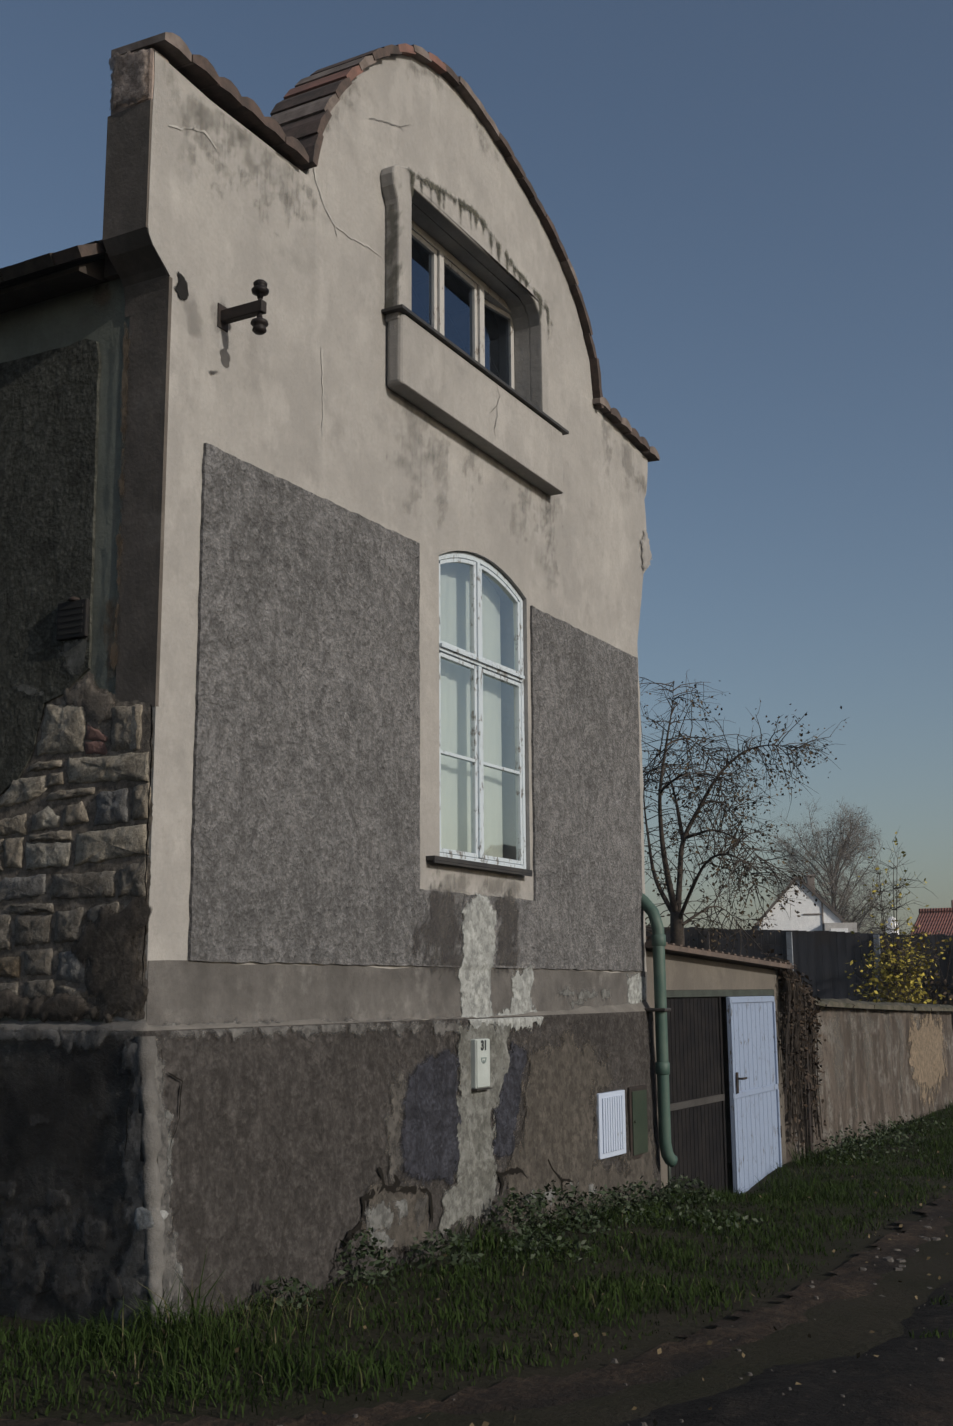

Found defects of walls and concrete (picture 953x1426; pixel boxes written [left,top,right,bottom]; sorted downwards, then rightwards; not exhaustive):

peeling [109,49,149,110]
leakage [410,170,552,332]
spalling [0,638,462,1337]